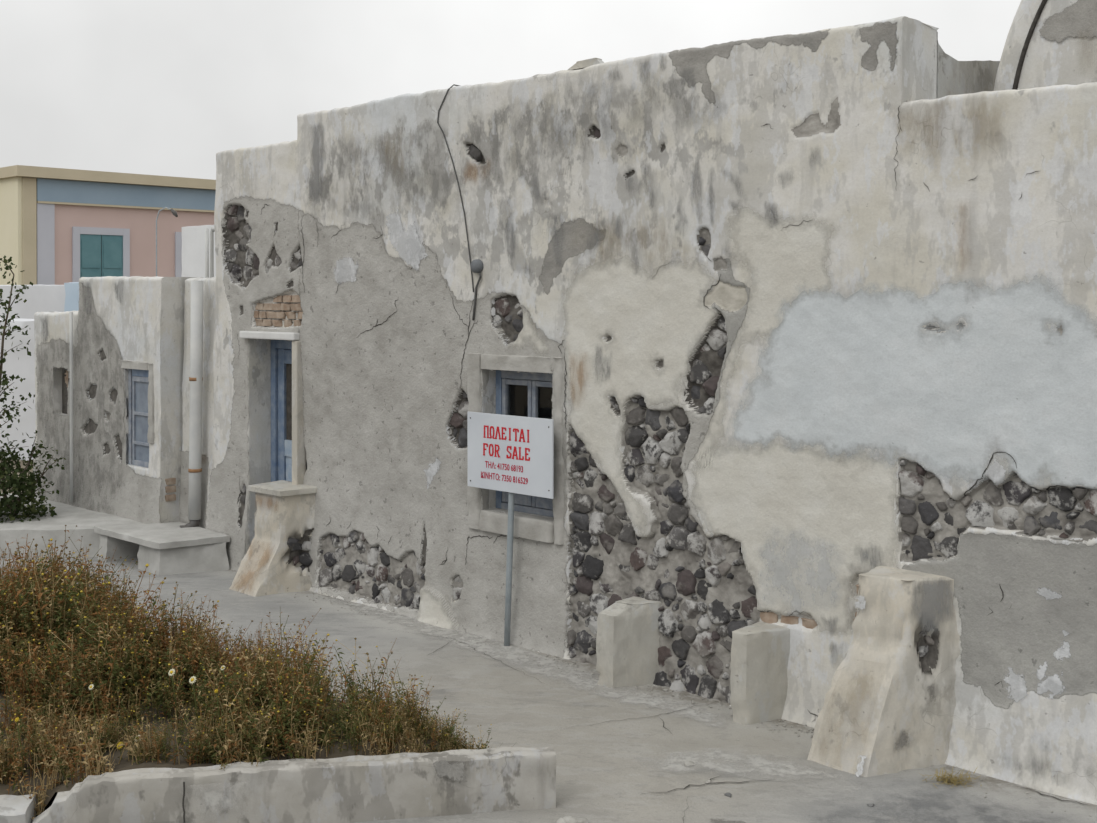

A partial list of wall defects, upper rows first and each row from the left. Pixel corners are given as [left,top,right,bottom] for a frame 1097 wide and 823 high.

flaking render [667,29,830,104]
flaking render [859,22,898,71]
crack [452,298,478,379]
flaking render [33,196,833,706]
flaking render [896,459,1097,709]